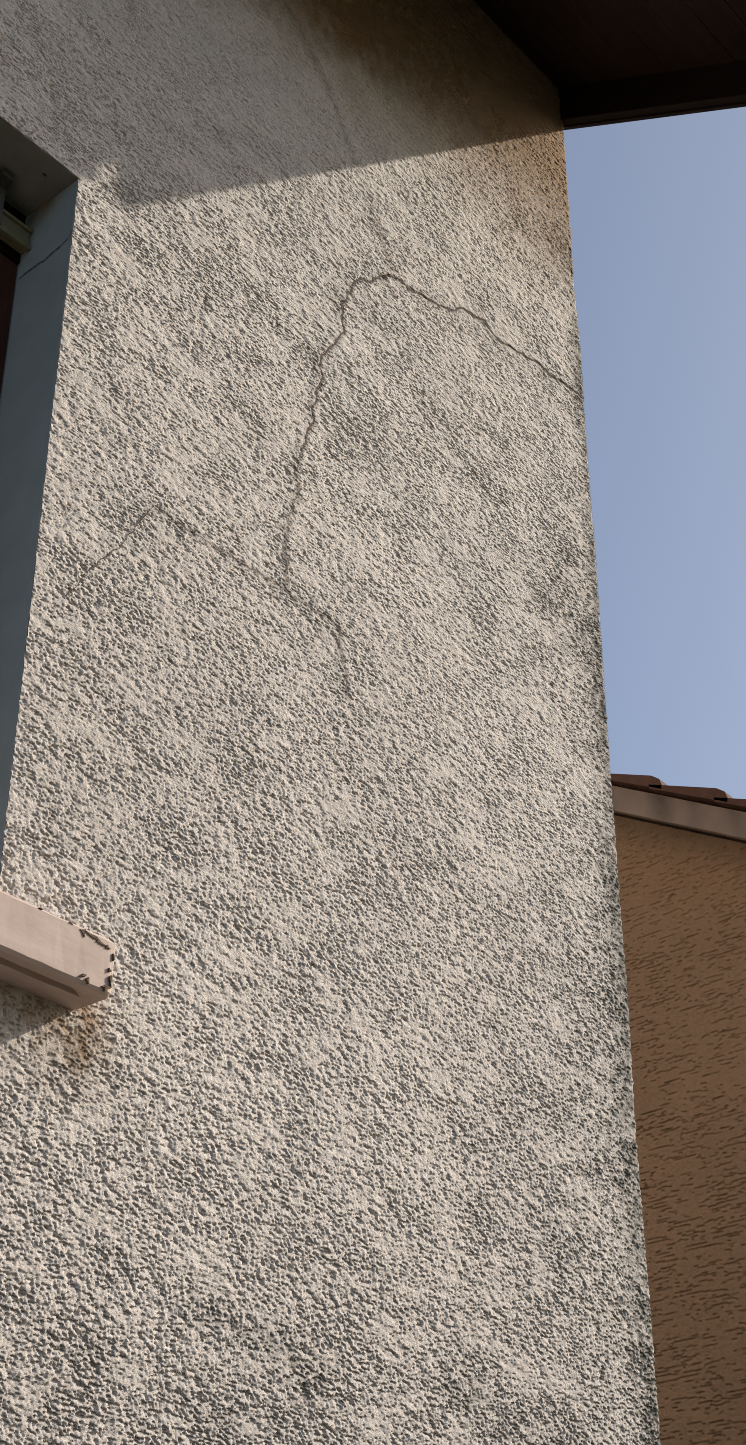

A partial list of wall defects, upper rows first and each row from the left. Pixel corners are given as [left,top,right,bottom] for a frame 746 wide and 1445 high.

crack [61,31,583,697]